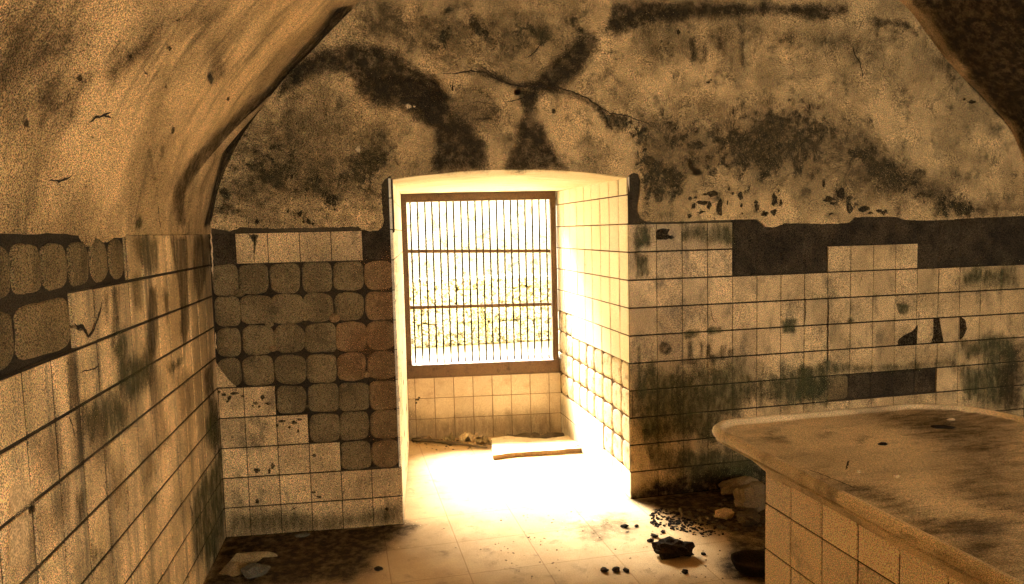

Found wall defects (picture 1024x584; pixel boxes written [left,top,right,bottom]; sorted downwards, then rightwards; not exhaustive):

crack [89,112,111,123]
crack [433,63,658,129]
damp [369,4,996,217]
peeling [688,181,1024,276]
crack [74,300,103,338]
damp [105,287,119,342]
damp [689,342,734,364]
spalling [898,325,918,346]
spalling [931,317,944,343]
peeling [826,368,935,401]
damp [68,357,84,465]
damp [631,466,765,499]